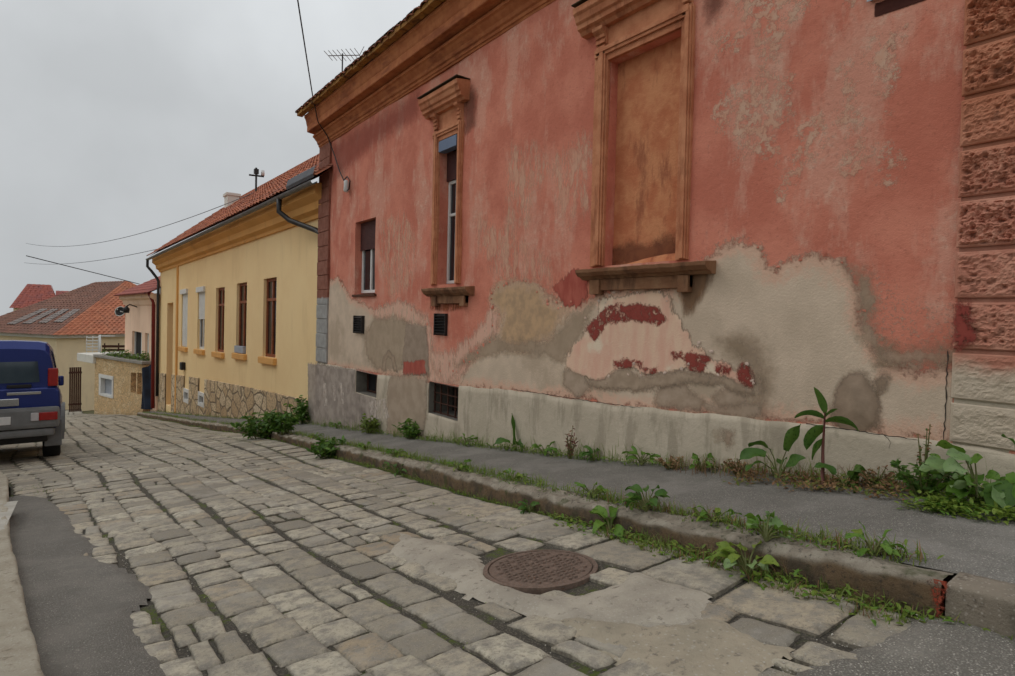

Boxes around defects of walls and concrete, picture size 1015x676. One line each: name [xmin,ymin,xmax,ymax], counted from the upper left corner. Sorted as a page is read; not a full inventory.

flaking render [328,236,976,443]